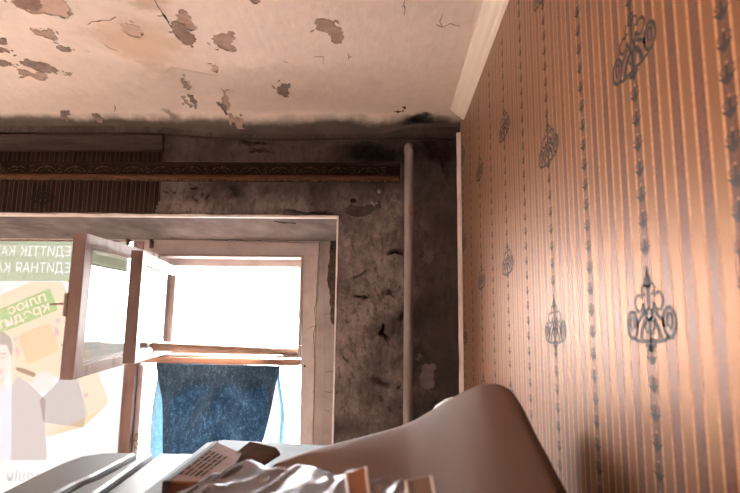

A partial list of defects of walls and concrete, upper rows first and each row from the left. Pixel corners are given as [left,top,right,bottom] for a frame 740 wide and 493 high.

peeling [4,0,74,19]
peeling [29,28,74,53]
crack [154,0,187,46]
peeling [169,9,198,48]
peeling [207,31,237,52]
peeling [310,18,345,44]
peeling [0,37,72,81]
peeling [180,74,198,109]
peeling [272,79,291,98]
peeling [216,89,244,129]
leakage [405,112,434,125]
spalling [345,188,383,216]